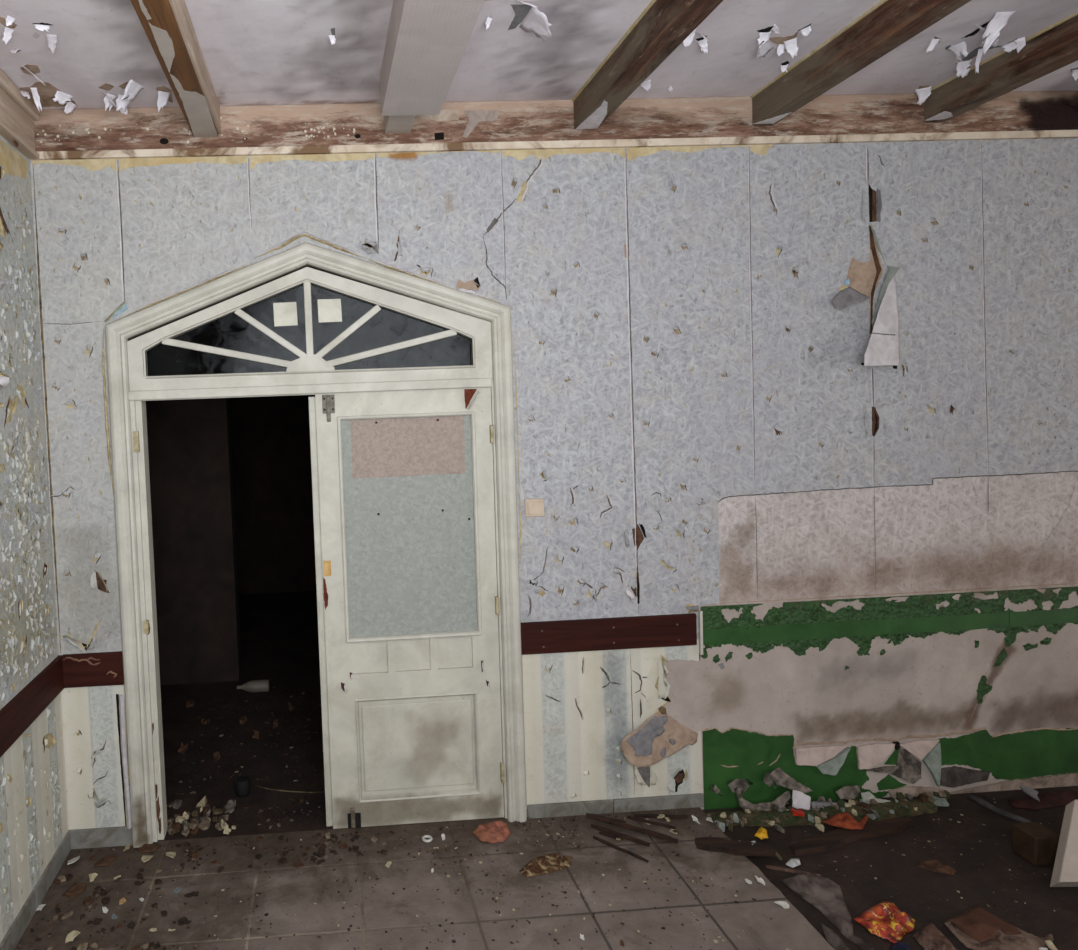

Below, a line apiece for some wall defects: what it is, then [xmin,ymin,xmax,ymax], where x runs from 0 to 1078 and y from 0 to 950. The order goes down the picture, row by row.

peeling [0,15,21,53]
peeling [32,23,57,54]
peeling [19,64,78,114]
peeling [98,0,218,138]
peeling [683,29,708,53]
peeling [756,23,812,73]
peeling [915,85,932,105]
peeling [926,11,1026,78]
leakage [1020,97,1078,131]
crack [483,153,544,299]
peeling [685,586,1078,704]
peeling [692,728,1078,824]